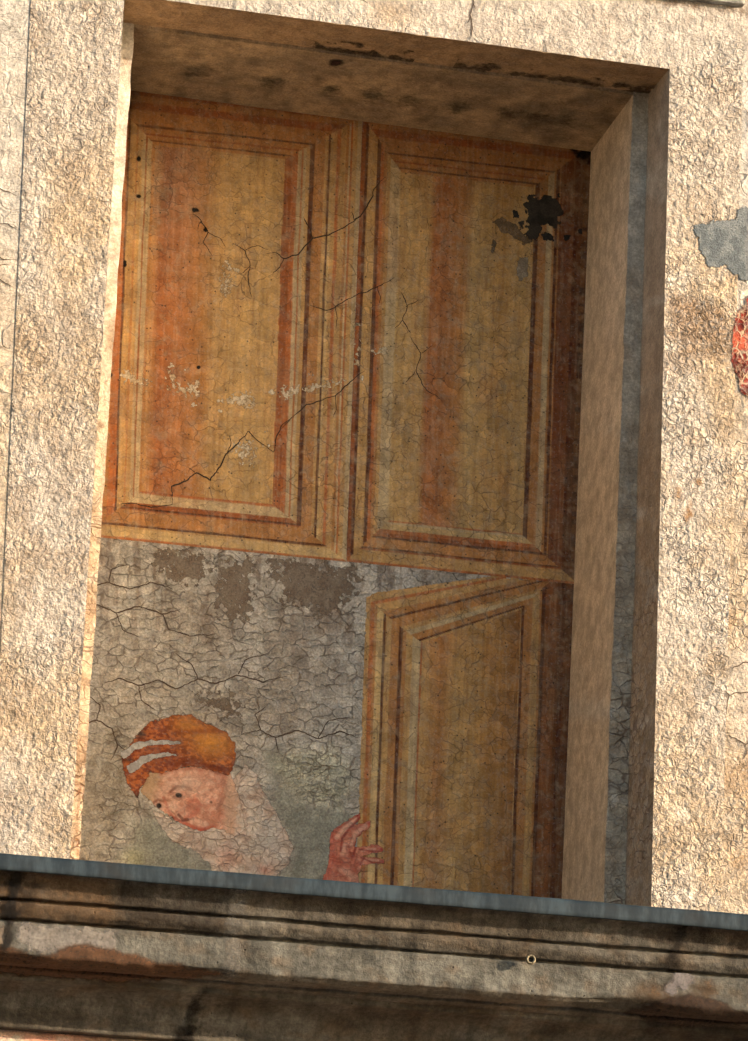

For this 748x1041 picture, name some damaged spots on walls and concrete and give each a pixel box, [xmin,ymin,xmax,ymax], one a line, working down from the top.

crack [194,179,383,297]
peeling [491,193,582,281]
crack [310,278,440,399]
crack [119,371,364,508]
crack [89,564,357,758]
leakage [0,871,247,983]
leakage [174,992,205,1041]
leakage [665,926,694,996]